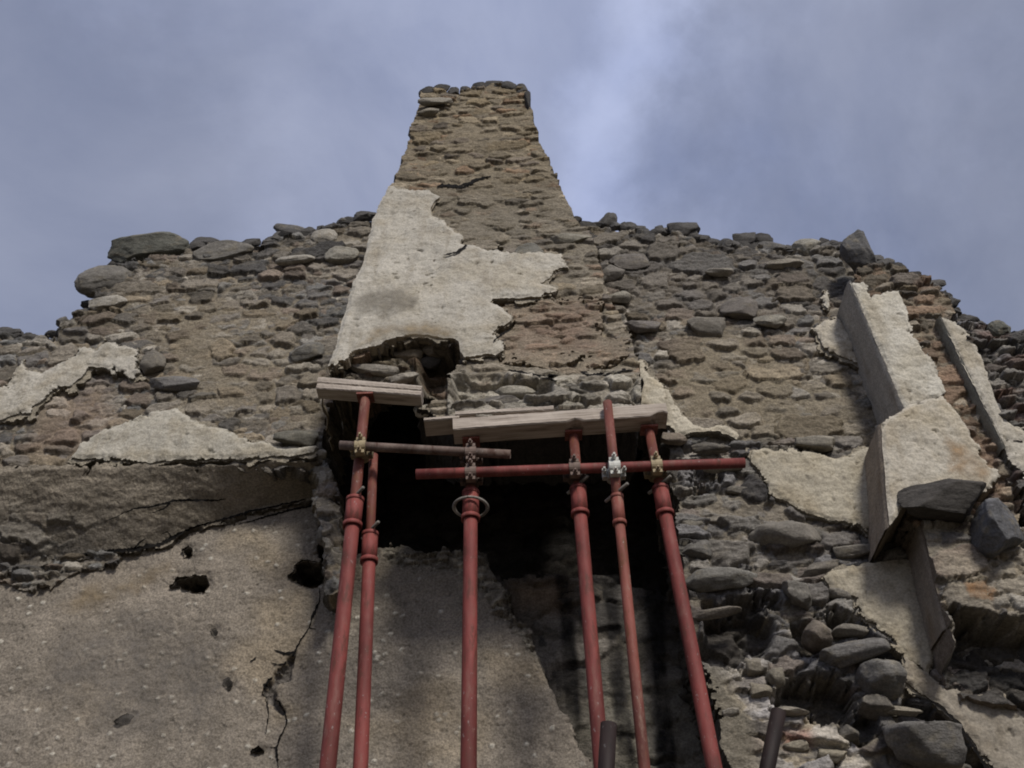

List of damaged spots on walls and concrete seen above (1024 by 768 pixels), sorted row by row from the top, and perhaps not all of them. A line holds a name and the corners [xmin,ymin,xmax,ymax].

peeling [0,338,147,425]
peeling [328,186,869,538]
peeling [68,405,319,469]
crack [82,499,312,556]
spalling [169,574,210,593]
spalling [287,559,324,588]
crack [250,588,320,768]